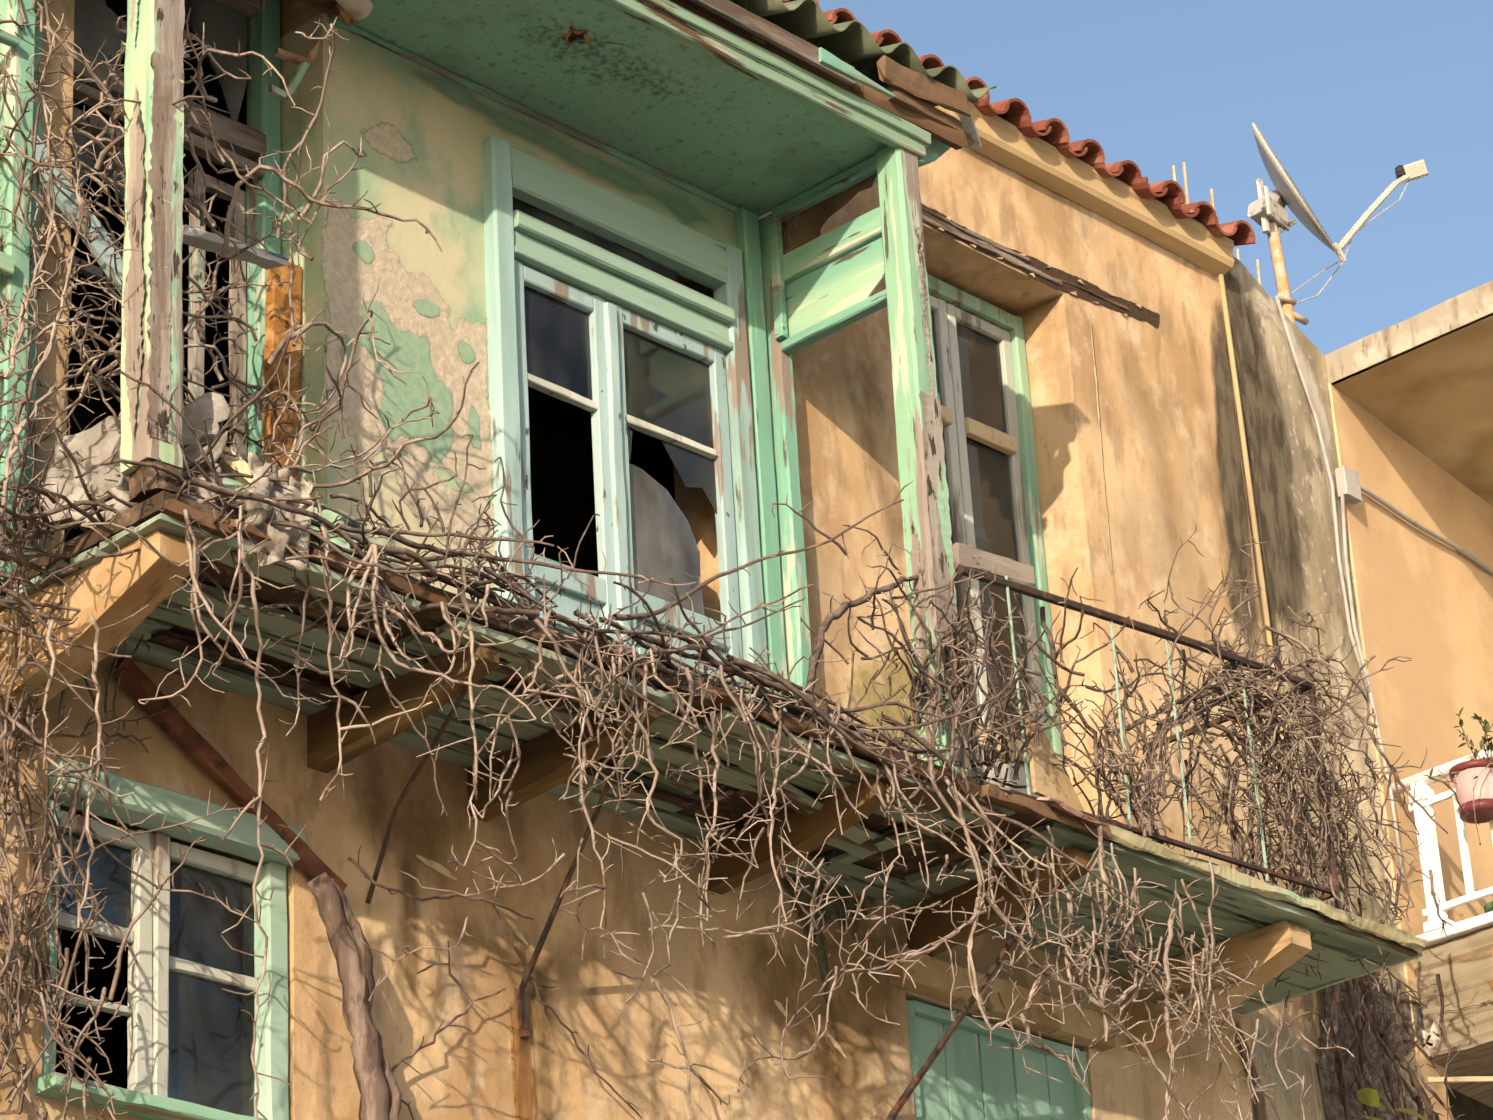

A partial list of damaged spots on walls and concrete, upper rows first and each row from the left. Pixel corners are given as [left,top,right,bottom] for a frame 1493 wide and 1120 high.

peeling [321,197,495,574]
leakage [1213,272,1302,667]